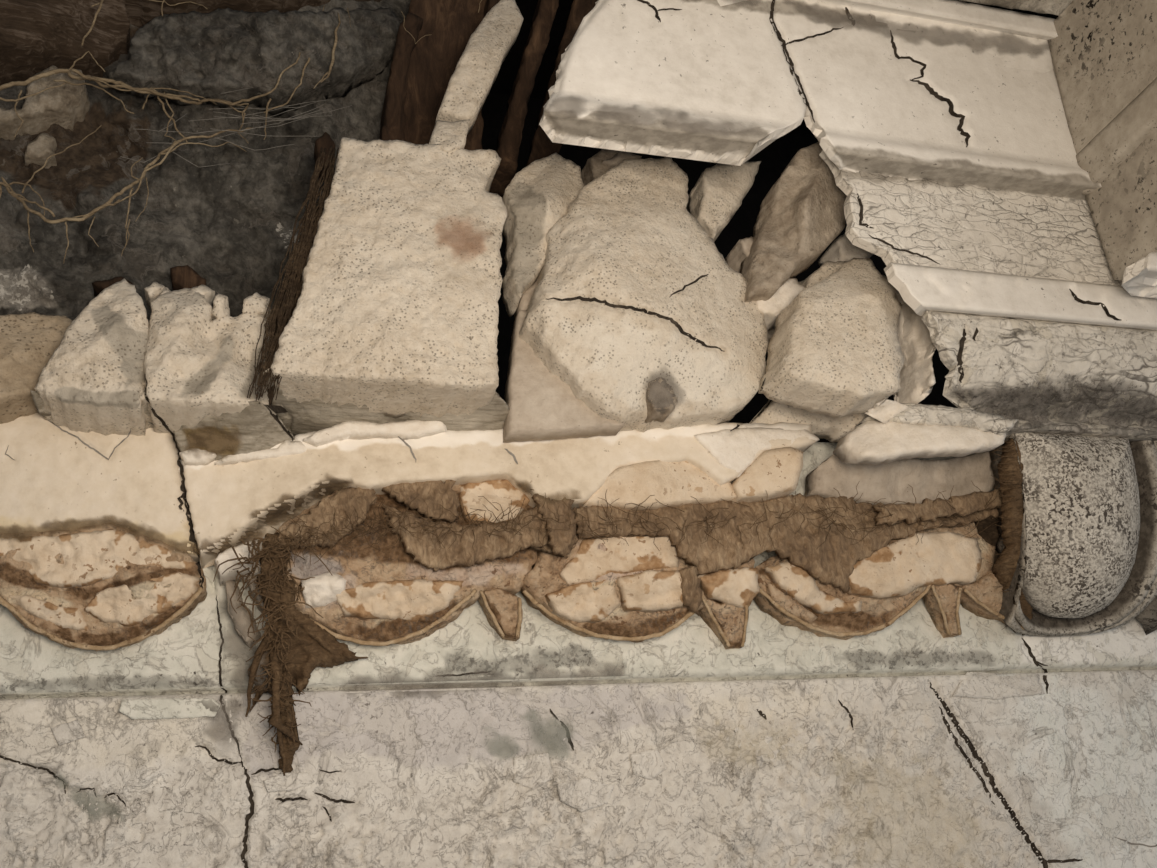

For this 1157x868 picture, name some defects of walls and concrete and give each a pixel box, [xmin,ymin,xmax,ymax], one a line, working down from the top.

crack [637,0,682,22]
crack [769,0,854,123]
crack [891,32,971,147]
crack [547,274,725,352]
flaking render [694,427,820,480]
crack [48,378,355,868]
crack [930,682,1083,868]
crack [1115,837,1157,847]